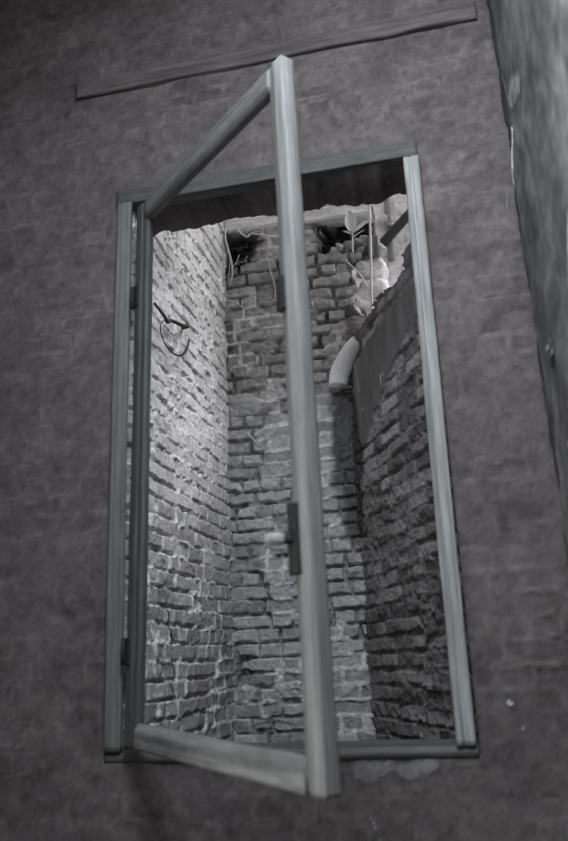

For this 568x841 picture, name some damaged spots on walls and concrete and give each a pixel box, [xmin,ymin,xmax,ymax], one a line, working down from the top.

flaking render [501,72,520,110]